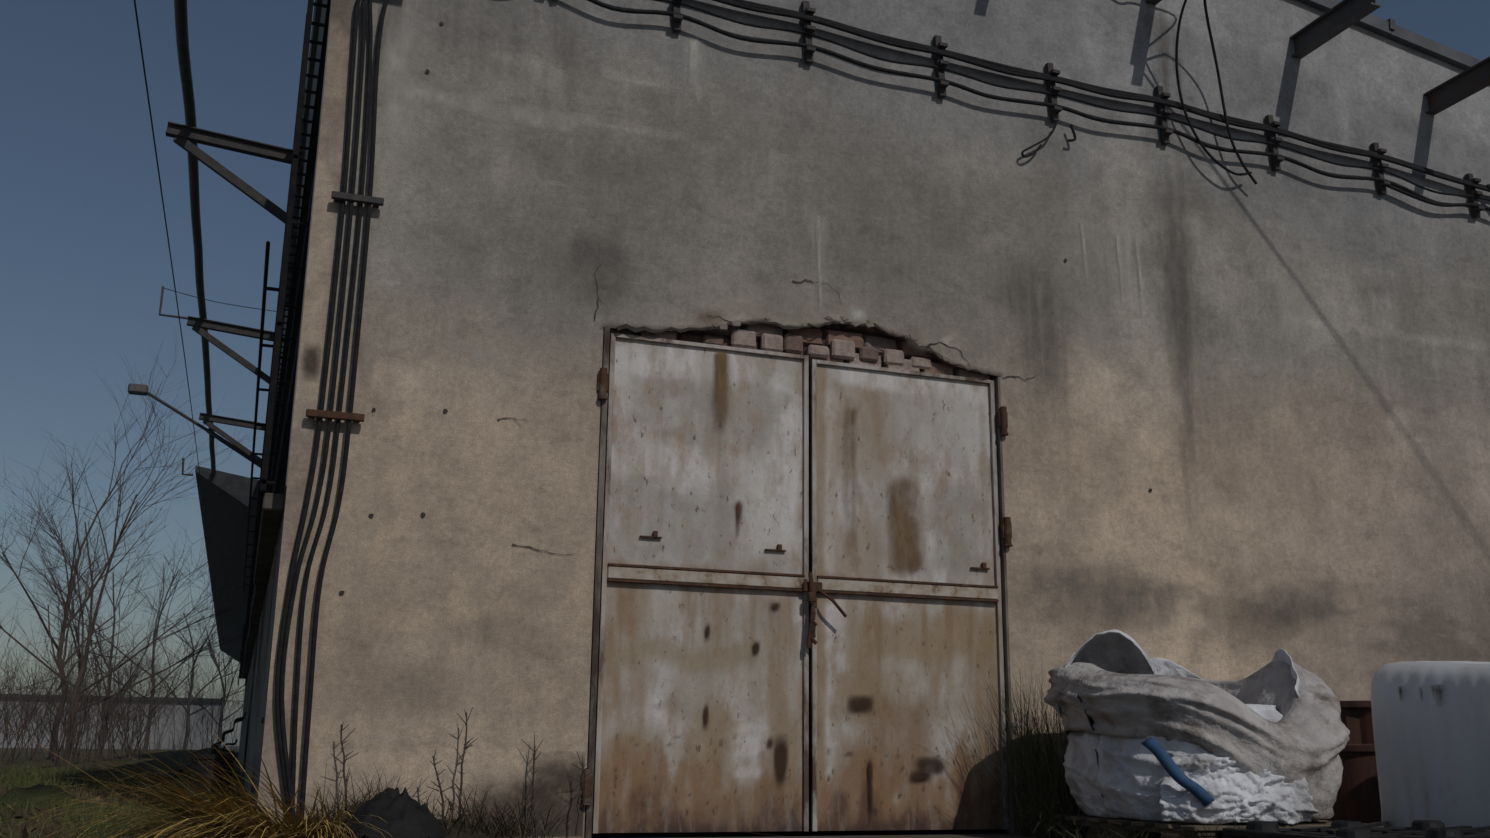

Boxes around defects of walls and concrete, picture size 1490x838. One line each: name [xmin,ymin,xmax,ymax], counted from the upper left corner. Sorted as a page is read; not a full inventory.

spalling [610,309,992,380]